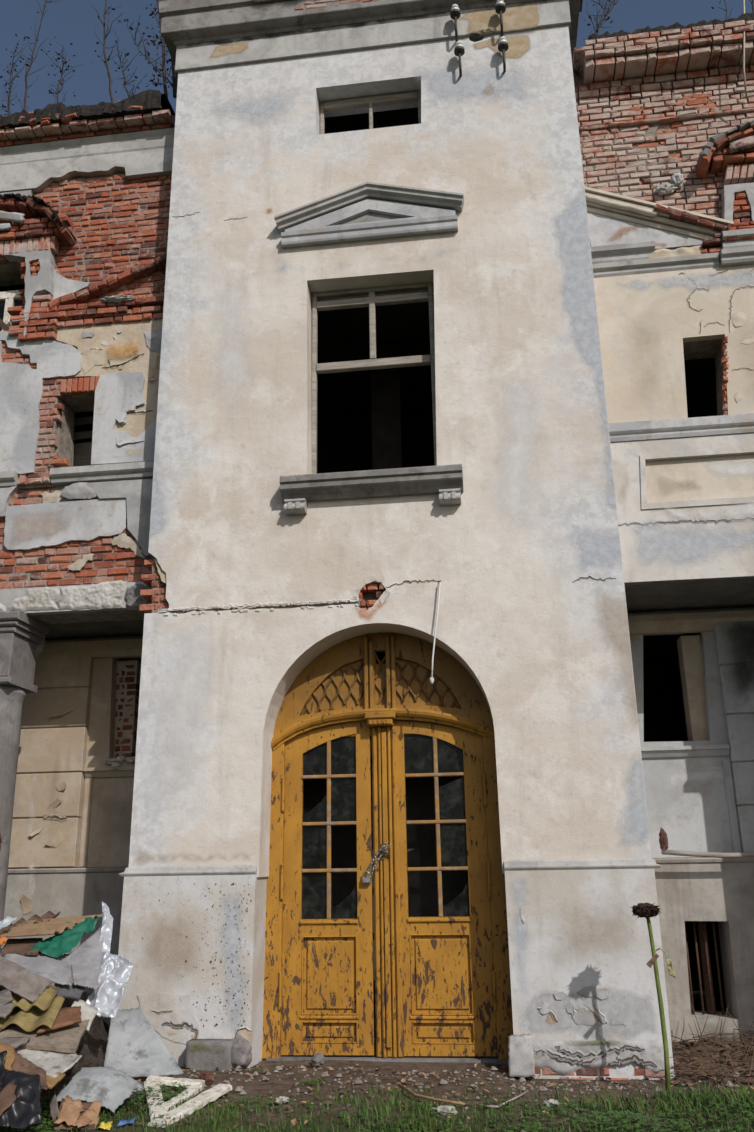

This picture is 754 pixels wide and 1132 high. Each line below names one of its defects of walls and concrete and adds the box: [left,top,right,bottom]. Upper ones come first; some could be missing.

flaking render [461,3,538,58]
flaking render [579,93,754,219]
flaking render [33,174,172,308]
flaking render [0,259,40,316]
crack [679,268,754,334]
water stain [558,193,616,505]
crack [732,365,754,373]
flaking render [0,342,169,613]
crack [156,598,362,616]
spalling [353,575,390,611]
crack [386,579,441,588]
crack [572,575,616,583]